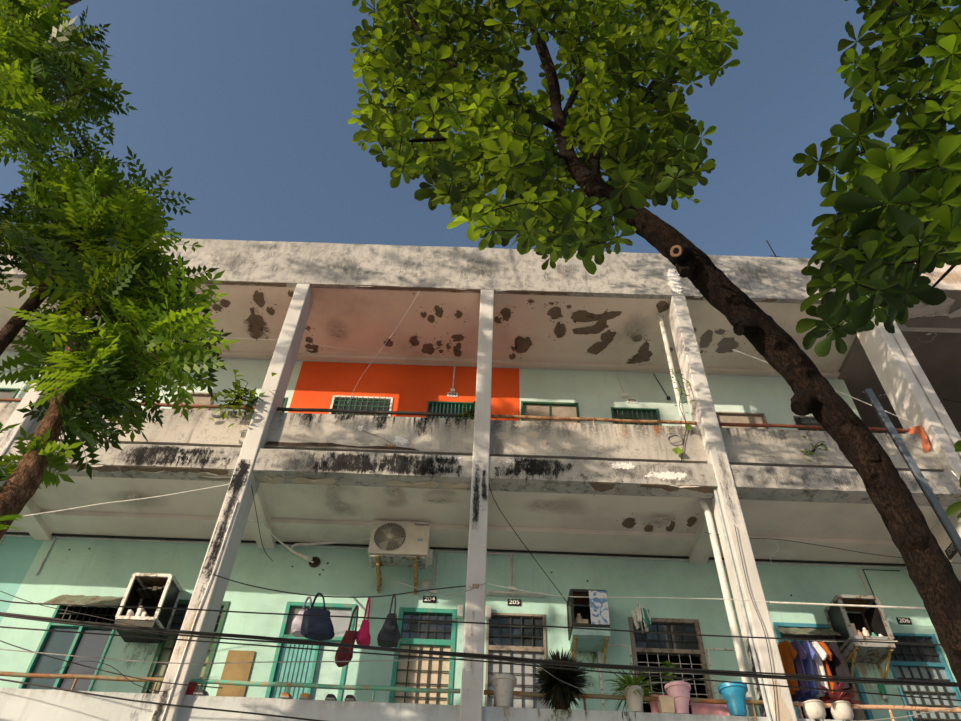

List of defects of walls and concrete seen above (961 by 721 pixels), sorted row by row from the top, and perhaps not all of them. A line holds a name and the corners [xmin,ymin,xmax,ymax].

peeling [200,281,294,341]
spalling [354,285,480,294]
peeling [408,305,470,357]
peeling [493,290,653,364]
peeling [694,327,745,357]
water stain [281,452,461,478]
water stain [472,458,572,523]
water stain [116,445,250,645]
peeling [617,513,699,532]